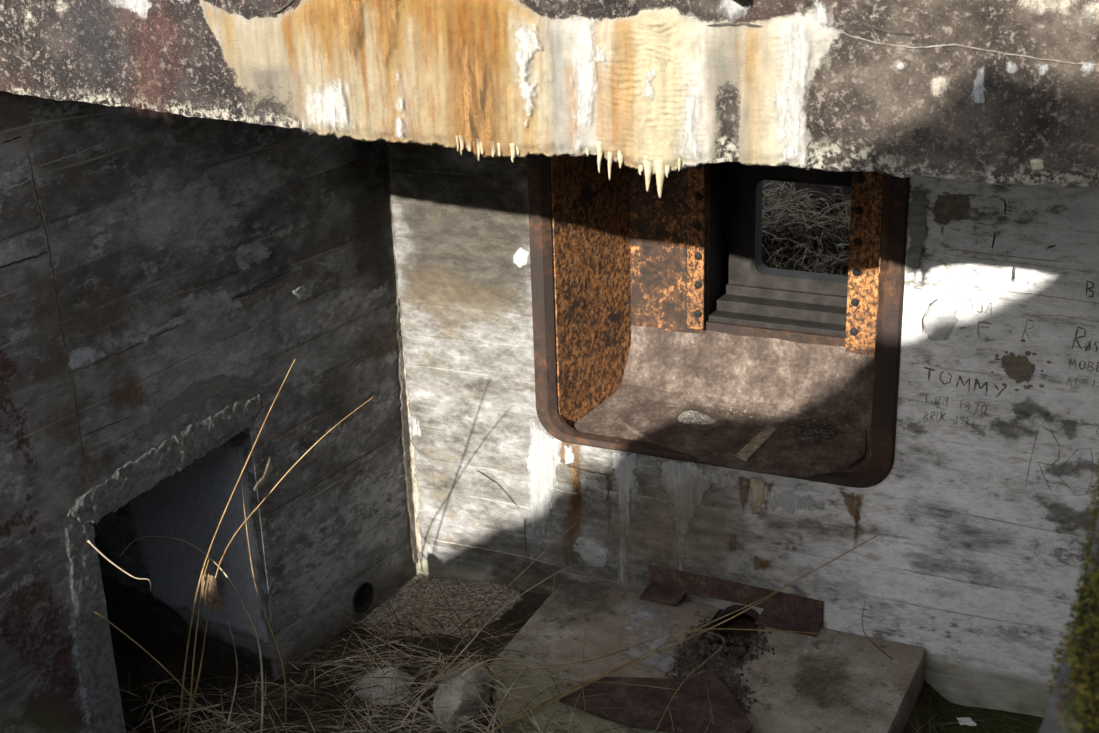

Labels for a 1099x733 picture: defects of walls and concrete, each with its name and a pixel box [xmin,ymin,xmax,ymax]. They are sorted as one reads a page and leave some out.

leakage [990,398,1049,438]
leakage [1061,421,1077,439]
leakage [1045,458,1099,476]
leakage [492,414,562,595]
rust [561,441,581,564]
leakage [611,452,640,586]
efflorescence [657,459,749,571]
rust [739,476,774,514]
rust [841,491,863,543]
leakage [1042,502,1097,531]
leakage [621,600,680,674]